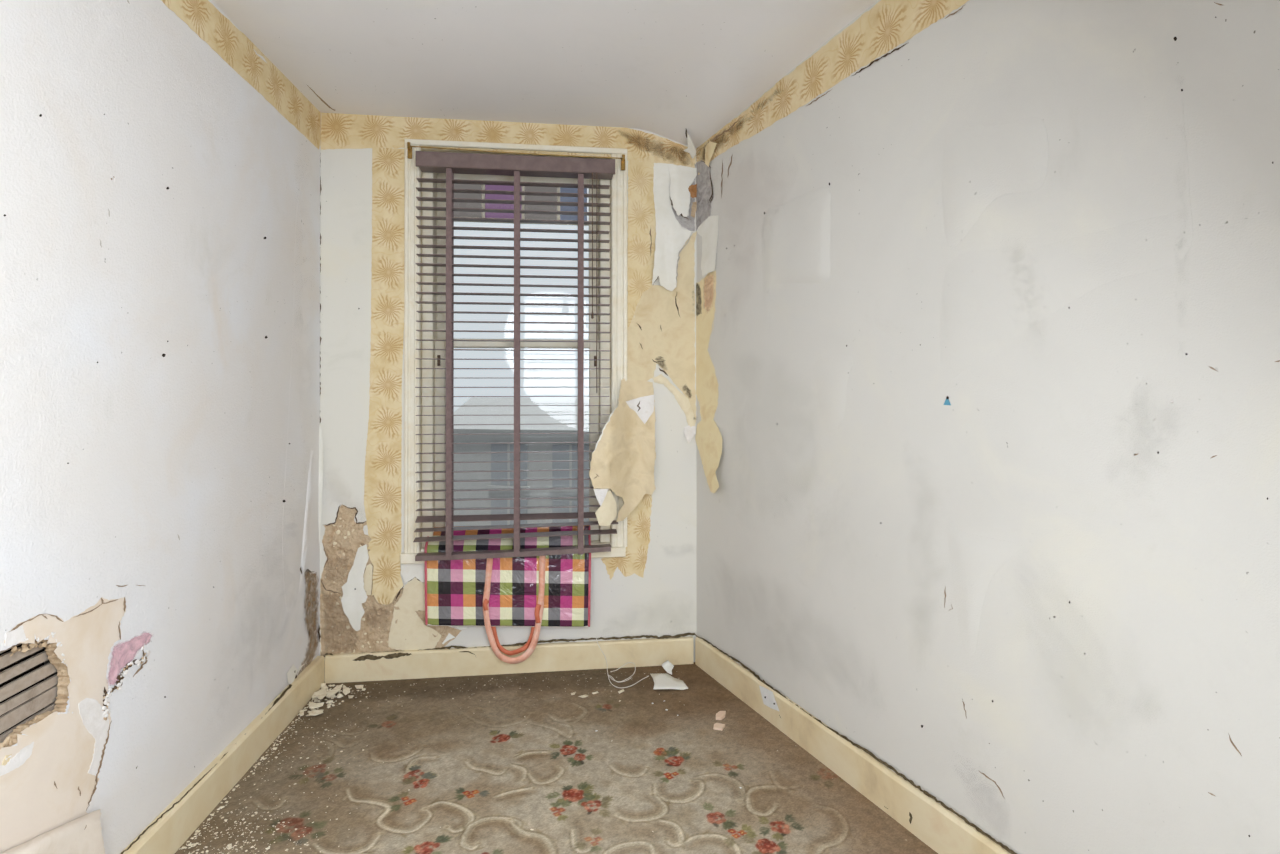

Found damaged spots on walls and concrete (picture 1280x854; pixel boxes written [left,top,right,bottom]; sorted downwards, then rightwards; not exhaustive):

flaking render [627,231,722,493]
flaking render [320,505,467,661]
flaking render [0,597,126,854]